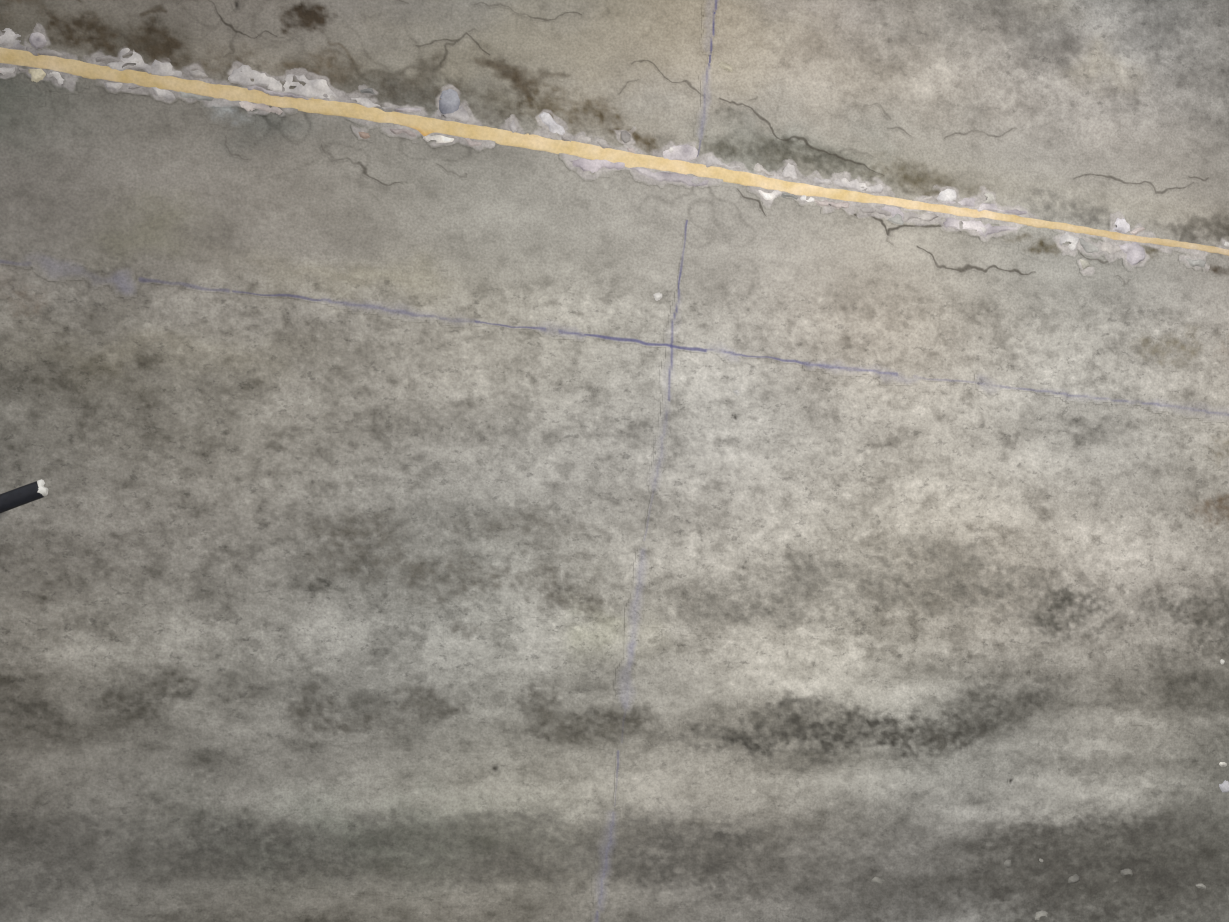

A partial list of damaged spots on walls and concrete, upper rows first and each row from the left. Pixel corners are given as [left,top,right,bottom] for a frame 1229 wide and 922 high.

crack [177,0,279,59]
crack [415,1,583,66]
crack [320,142,408,187]
crack [736,188,767,218]
crack [617,58,913,177]
water stain [688,92,993,200]
crack [852,214,1037,276]
crack [943,127,1019,140]
crack [1069,242,1131,287]
water stain [997,183,1229,279]
crack [1072,173,1210,196]
water stain [0,499,1229,778]